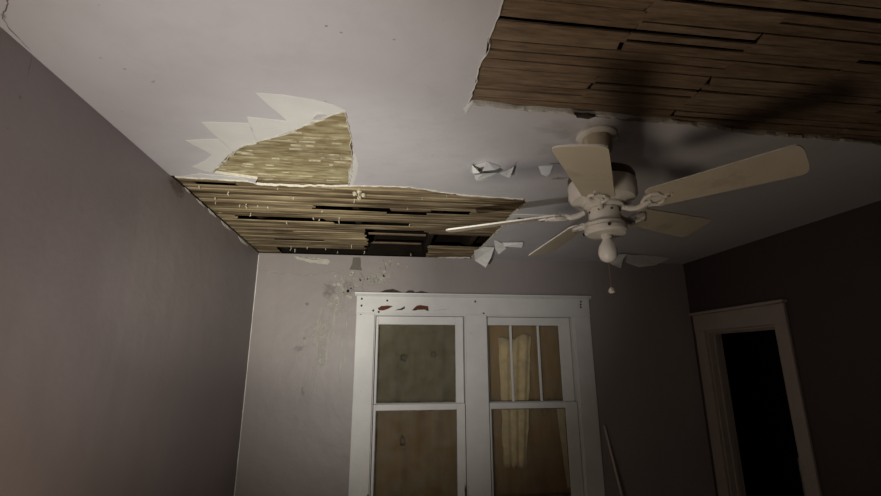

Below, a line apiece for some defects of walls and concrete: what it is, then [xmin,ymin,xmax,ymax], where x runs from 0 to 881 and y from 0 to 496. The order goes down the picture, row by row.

crack [2,0,32,77]
peeling [175,93,528,268]